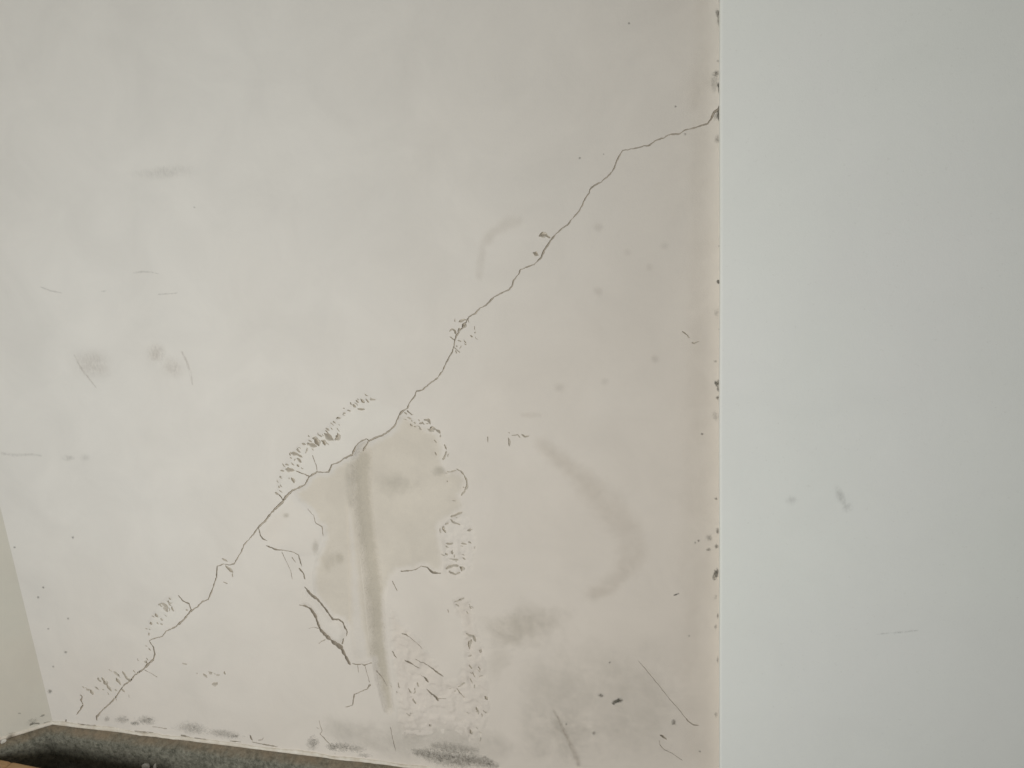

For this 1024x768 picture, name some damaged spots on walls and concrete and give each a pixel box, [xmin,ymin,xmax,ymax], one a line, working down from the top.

spalling [82,645,151,700]
spalling [259,394,491,744]
crack [65,106,719,726]